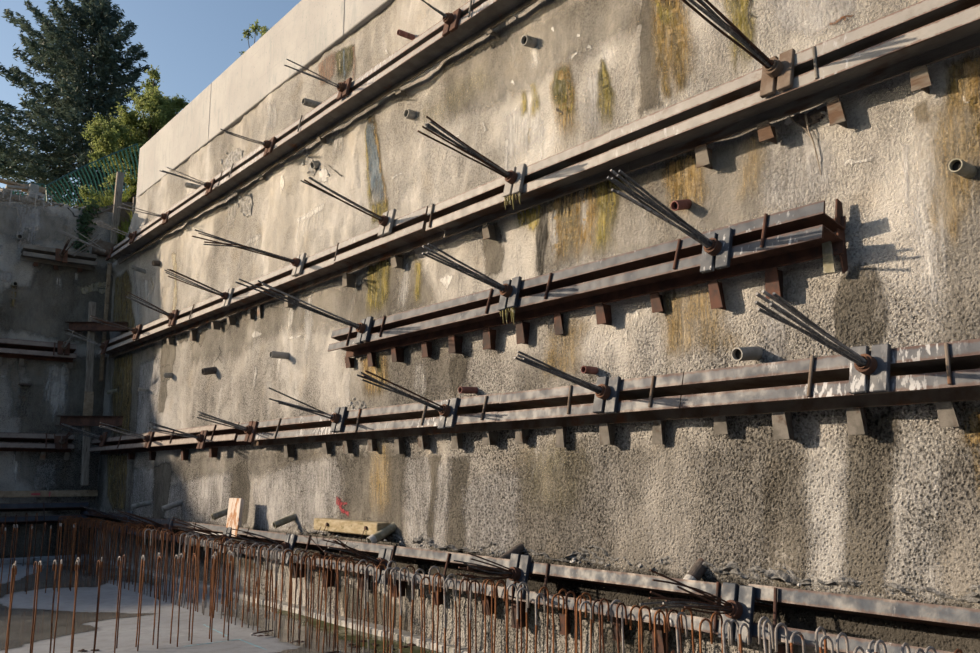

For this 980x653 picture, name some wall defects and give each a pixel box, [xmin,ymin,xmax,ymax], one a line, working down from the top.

water stain [444,0,689,116]
water stain [588,77,599,123]
spalling [0,187,52,209]
water stain [365,117,388,222]
water stain [904,102,980,342]
water stain [0,251,433,437]
water stain [833,266,887,346]